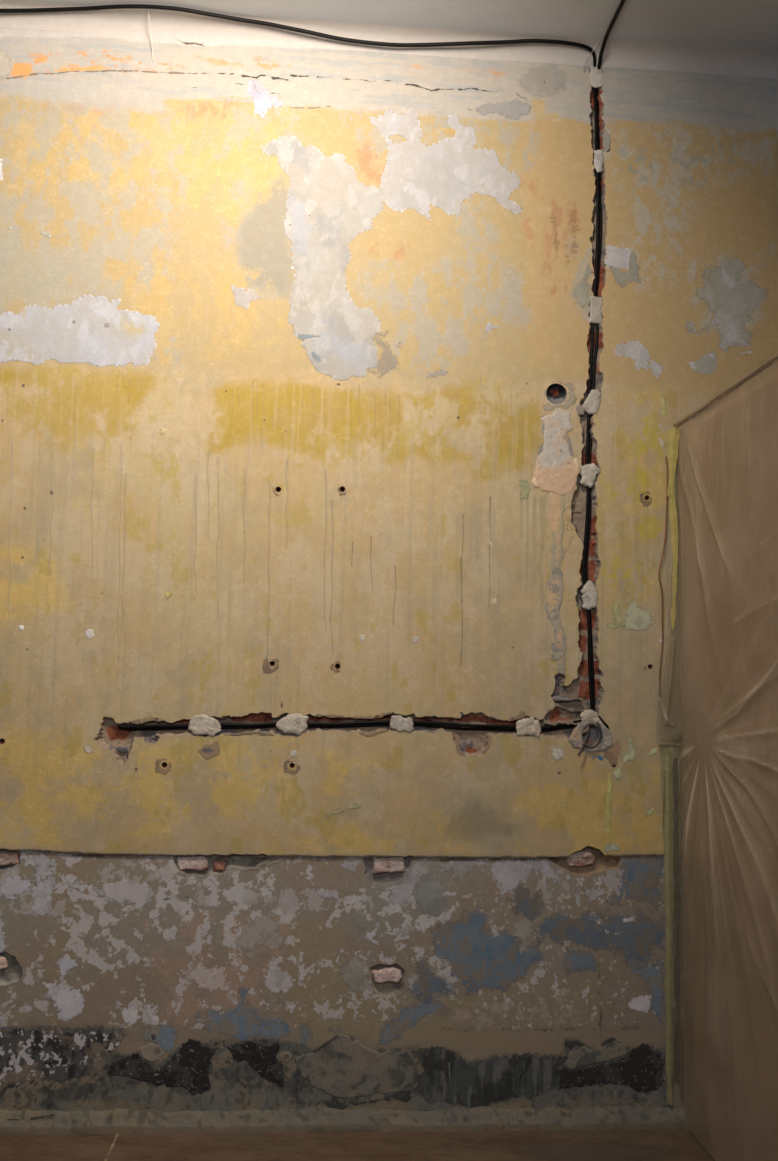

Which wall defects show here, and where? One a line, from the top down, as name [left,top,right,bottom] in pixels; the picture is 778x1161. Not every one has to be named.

crack [0,41,531,108]
peeling [260,99,531,381]
peeling [605,244,641,288]
peeling [0,294,161,367]
peeling [231,284,265,311]
peeling [685,256,770,375]
peeling [614,340,664,378]
spalling [173,853,268,877]
spalling [363,855,414,887]
spalling [548,846,621,907]
spalling [0,951,23,986]
spalling [370,963,405,1001]